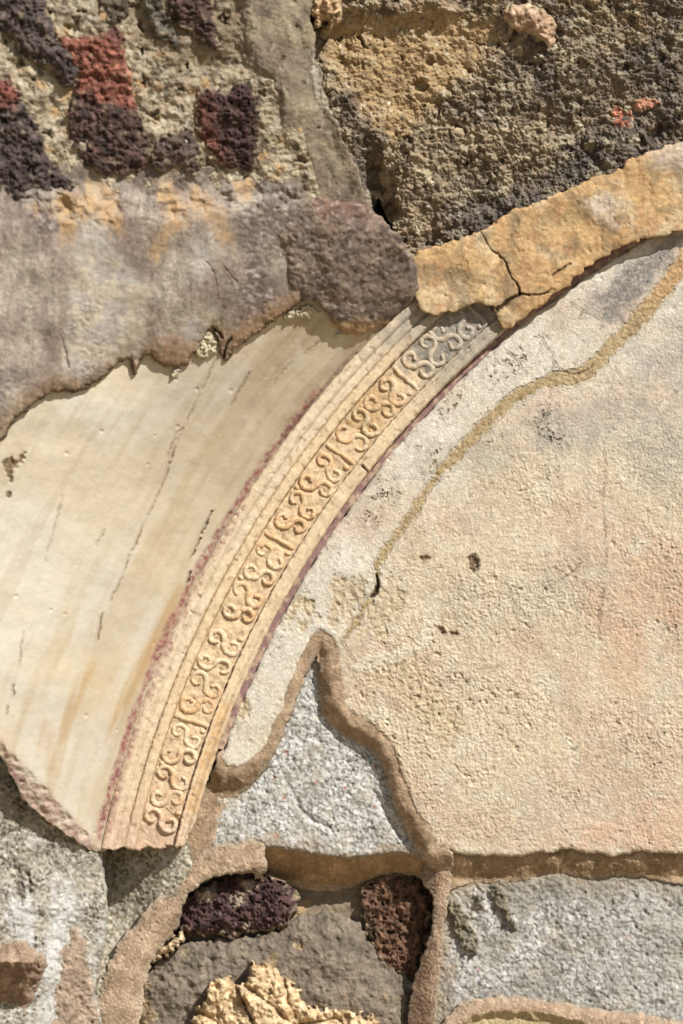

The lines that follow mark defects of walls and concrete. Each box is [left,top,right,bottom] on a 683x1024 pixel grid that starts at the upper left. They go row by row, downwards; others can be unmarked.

crack [340,231,683,664]